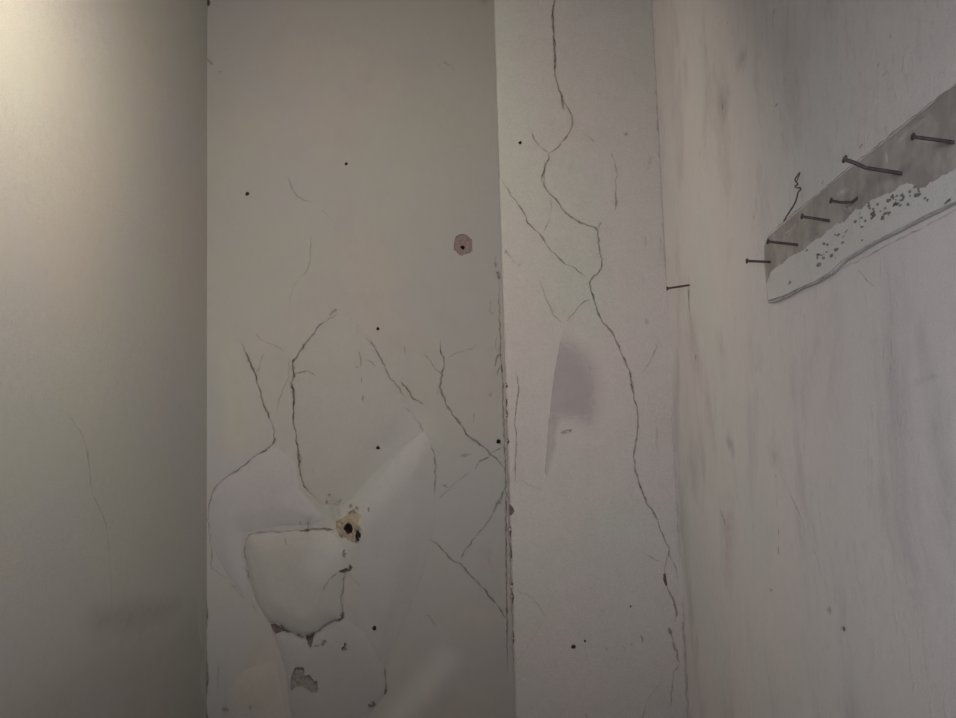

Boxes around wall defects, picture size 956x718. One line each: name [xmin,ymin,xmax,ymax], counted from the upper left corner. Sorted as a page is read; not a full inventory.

peeling [853,185,929,241]
spalling [454,234,473,256]
crack [237,323,323,494]
spalling [336,507,369,573]
spalling [291,667,318,693]